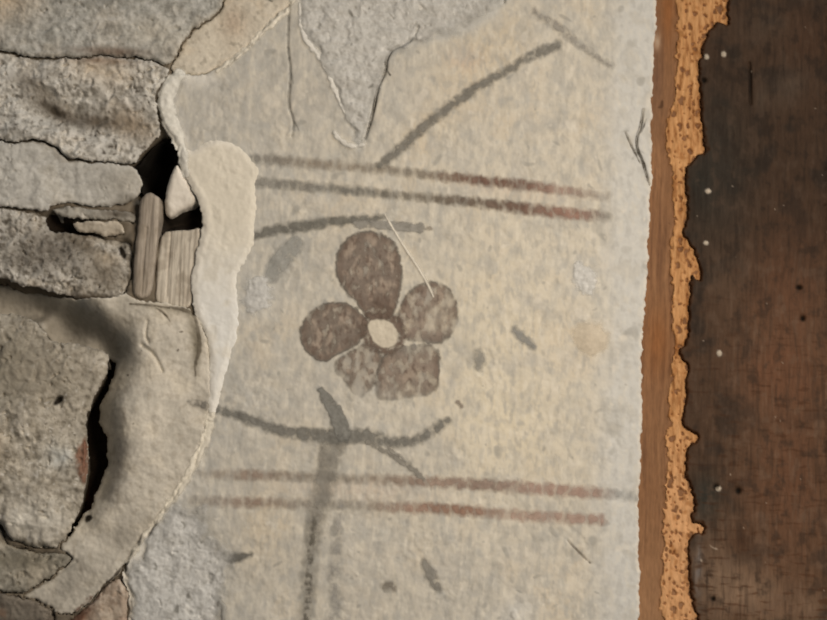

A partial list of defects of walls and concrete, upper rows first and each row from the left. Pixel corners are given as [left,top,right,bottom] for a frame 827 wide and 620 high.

flaking render [216,0,489,148]
crack [367,41,411,132]
crack [625,118,648,180]
flaking render [122,412,231,620]